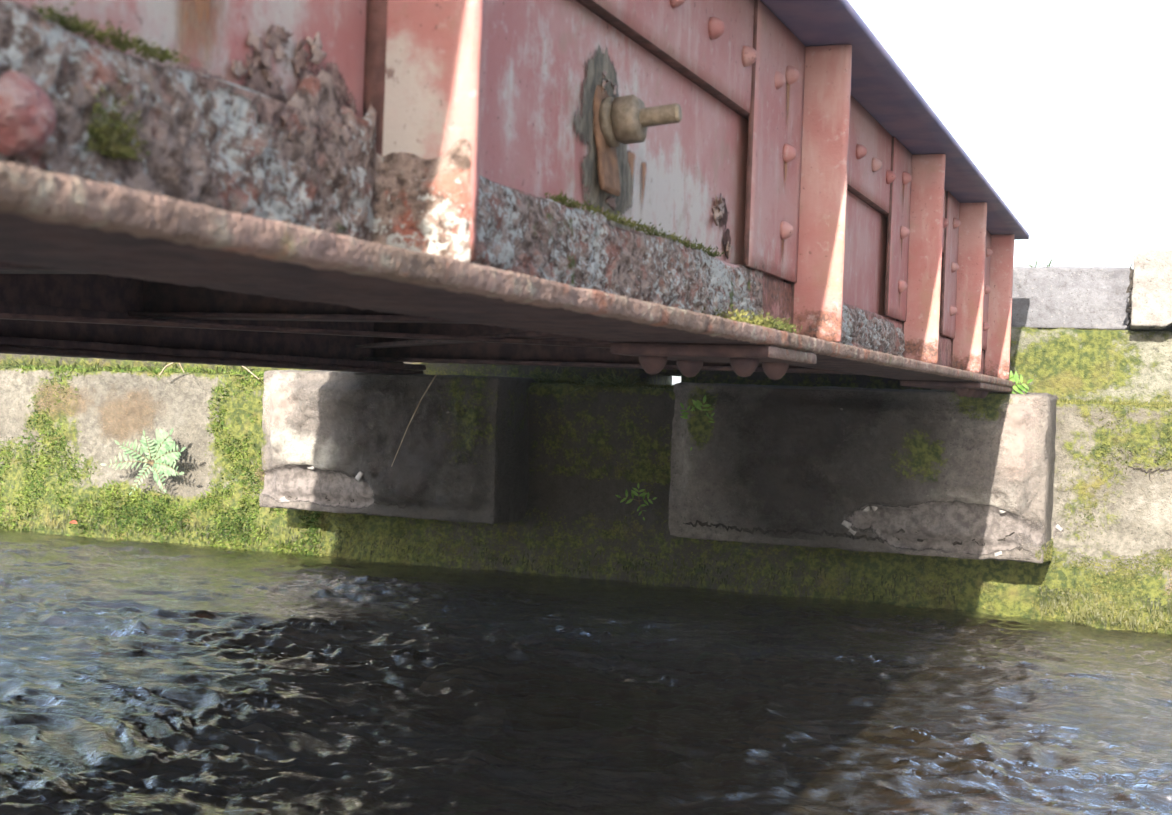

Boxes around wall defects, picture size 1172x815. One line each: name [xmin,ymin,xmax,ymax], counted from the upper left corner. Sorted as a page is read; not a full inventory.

peeling [177,24,357,147]
rust [627,151,646,197]
crack [1126,263,1172,329]
crack [684,520,1030,551]
spalling [842,501,1063,557]